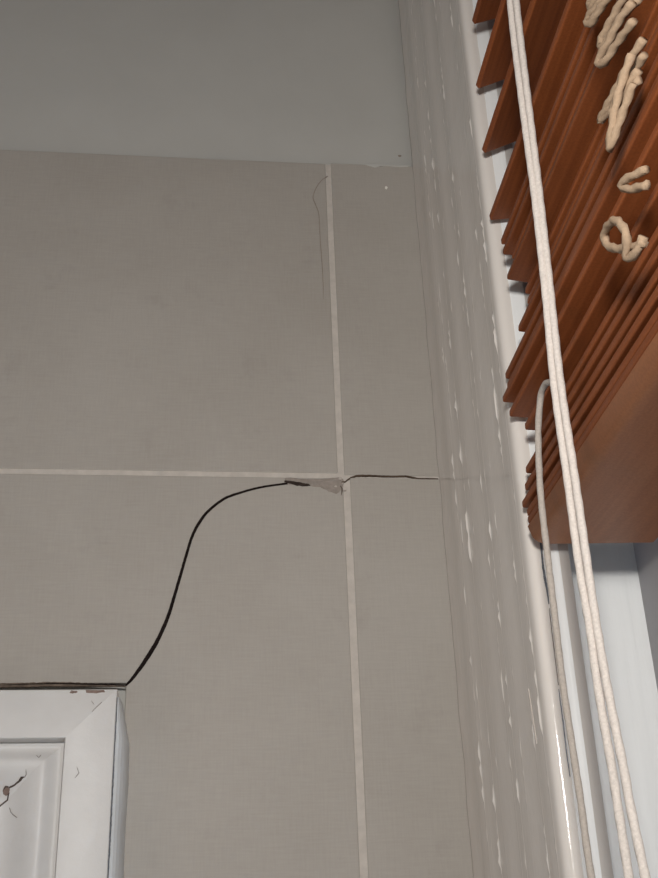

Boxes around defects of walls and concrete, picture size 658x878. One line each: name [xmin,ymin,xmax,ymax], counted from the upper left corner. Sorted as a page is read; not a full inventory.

crack [340,475,438,495]
crack [0,483,288,688]
crack [0,772,27,818]
crack [108,709,117,877]